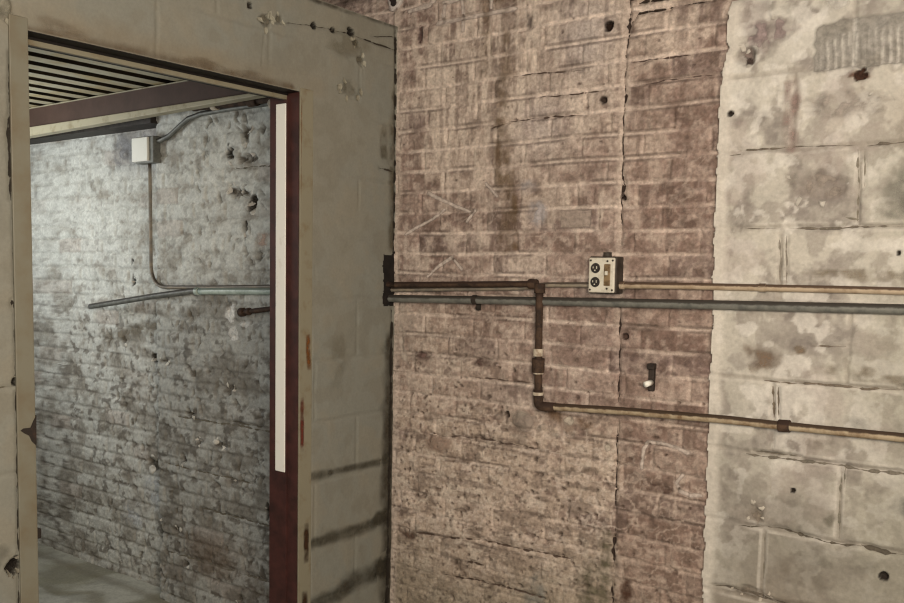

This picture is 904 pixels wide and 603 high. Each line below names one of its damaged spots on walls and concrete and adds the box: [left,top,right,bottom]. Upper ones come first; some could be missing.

crack [4,64,12,200]
crack [491,0,715,245]
crack [616,315,624,402]
crack [0,340,20,603]
crack [610,425,618,562]